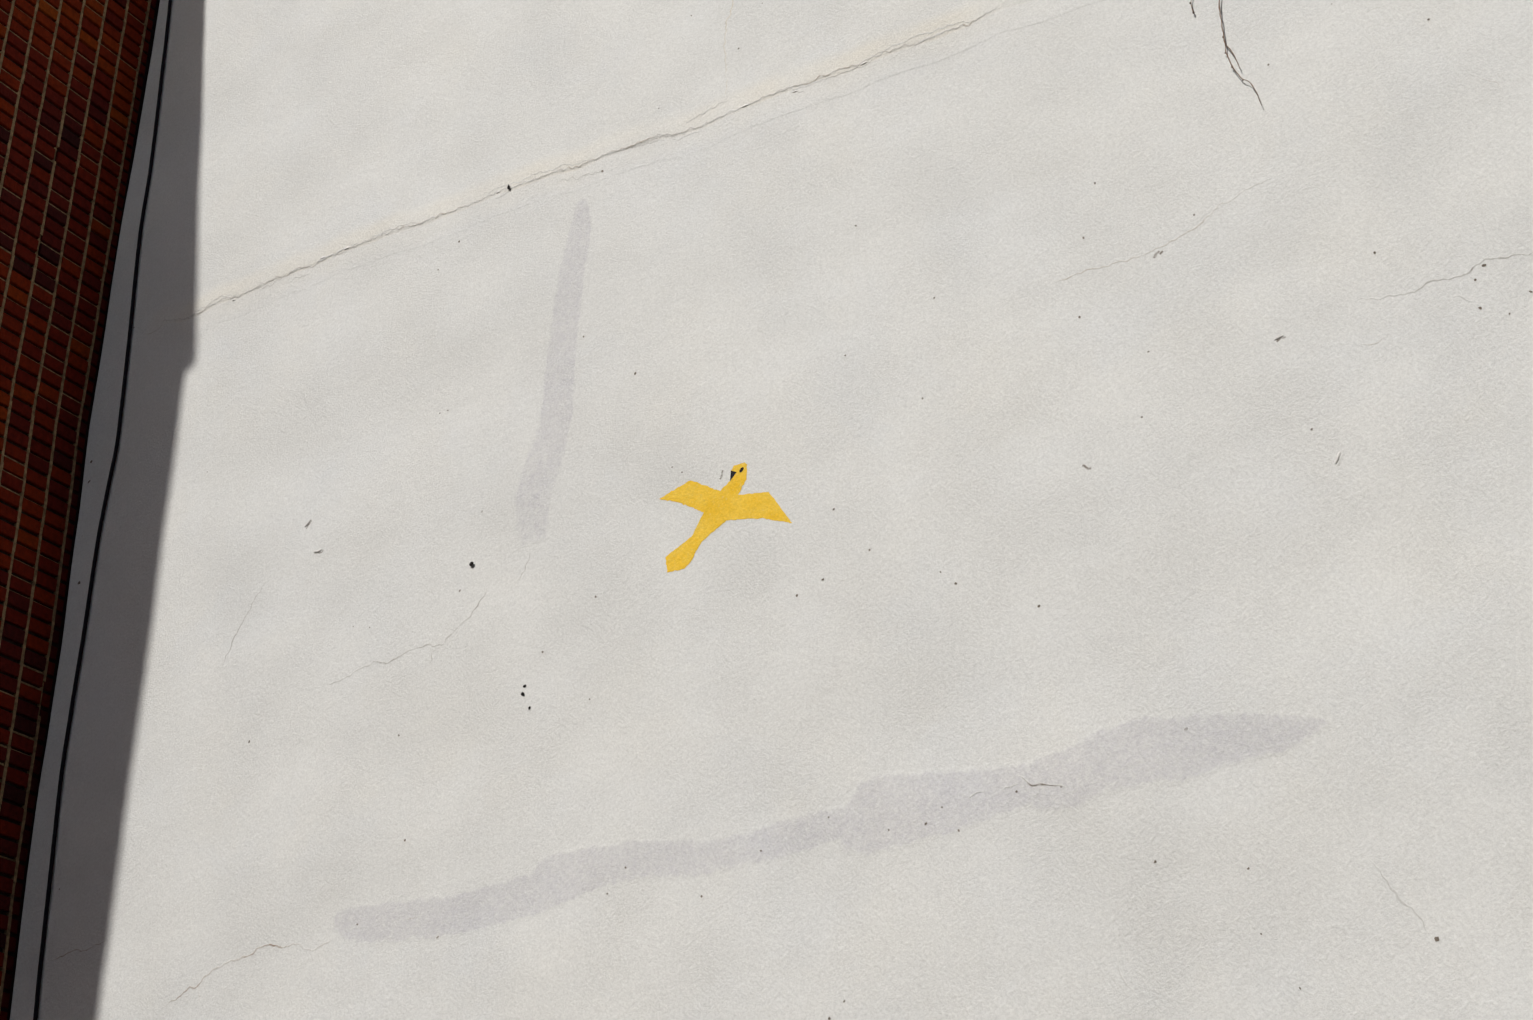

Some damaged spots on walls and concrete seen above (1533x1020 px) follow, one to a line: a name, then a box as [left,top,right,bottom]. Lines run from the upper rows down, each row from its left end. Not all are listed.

crack [143,0,996,336]
water stain [511,195,593,550]
water stain [332,708,1333,947]